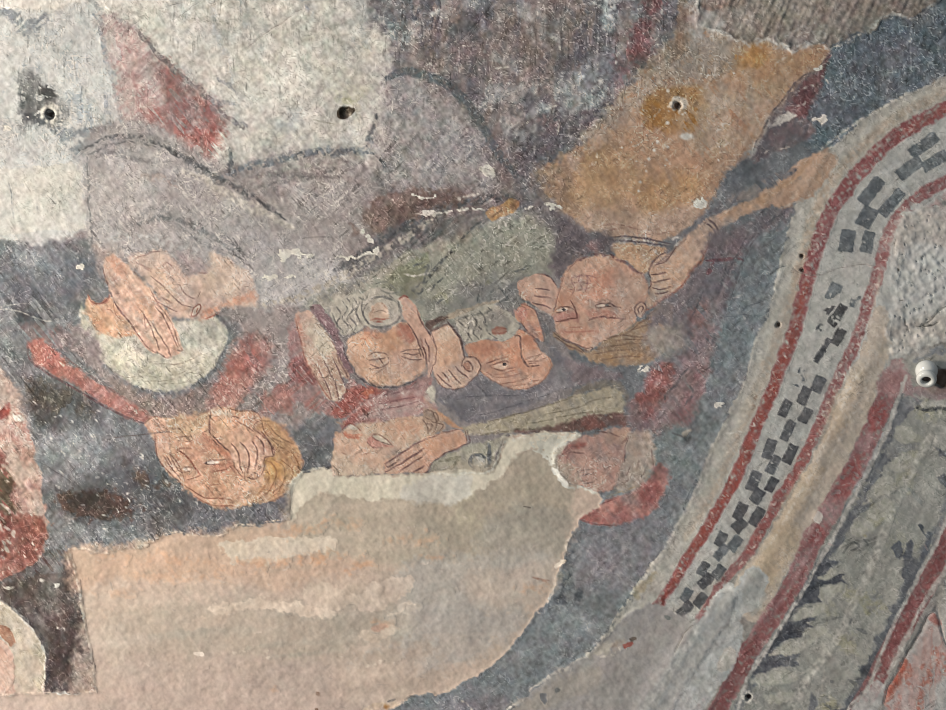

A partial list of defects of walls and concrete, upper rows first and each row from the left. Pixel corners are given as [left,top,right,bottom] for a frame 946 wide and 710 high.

flaking render [0,429,604,710]